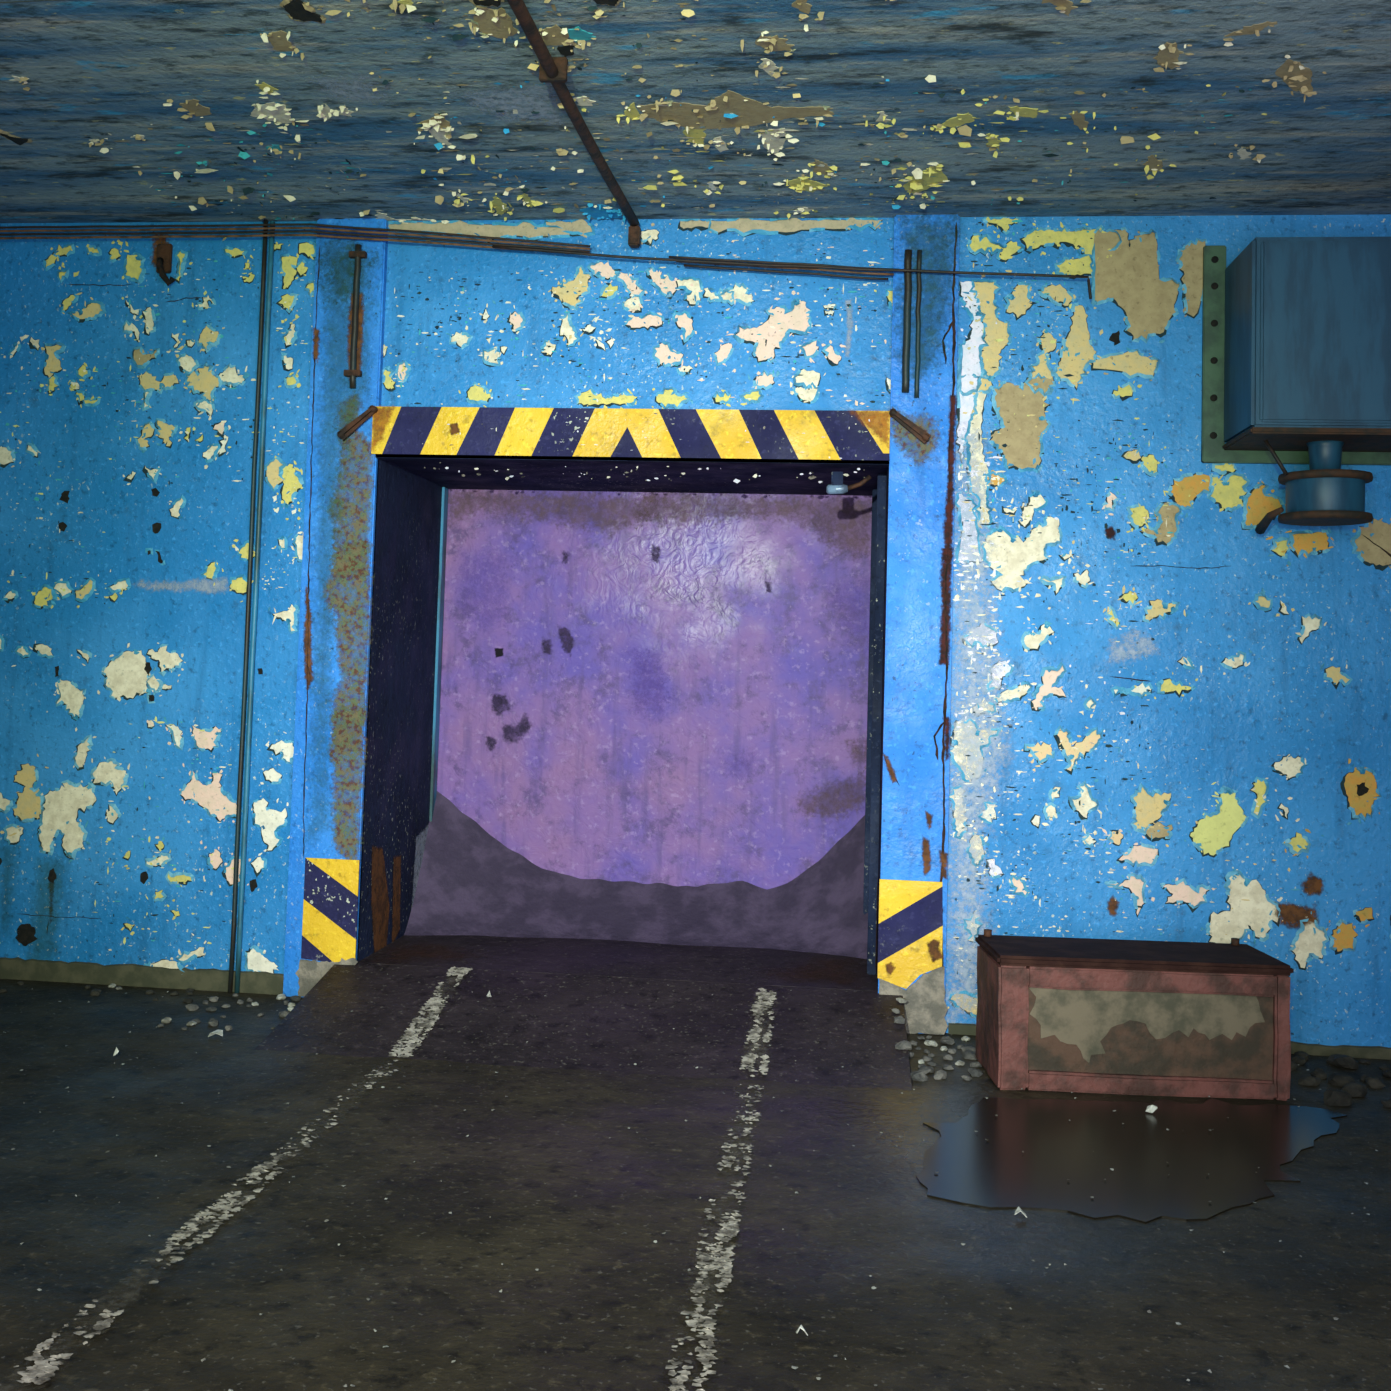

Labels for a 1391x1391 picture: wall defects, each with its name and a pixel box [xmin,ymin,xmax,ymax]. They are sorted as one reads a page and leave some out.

peeling [9,76,30,91]
peeling [84,124,153,154]
peeling [134,80,367,220]
peeling [260,0,626,88]
peeling [0,635,294,973]
peeling [0,237,316,609]
peeling [268,604,300,634]
corrosion [326,395,401,953]
peeling [359,0,1391,1035]
corrosion [852,395,956,665]